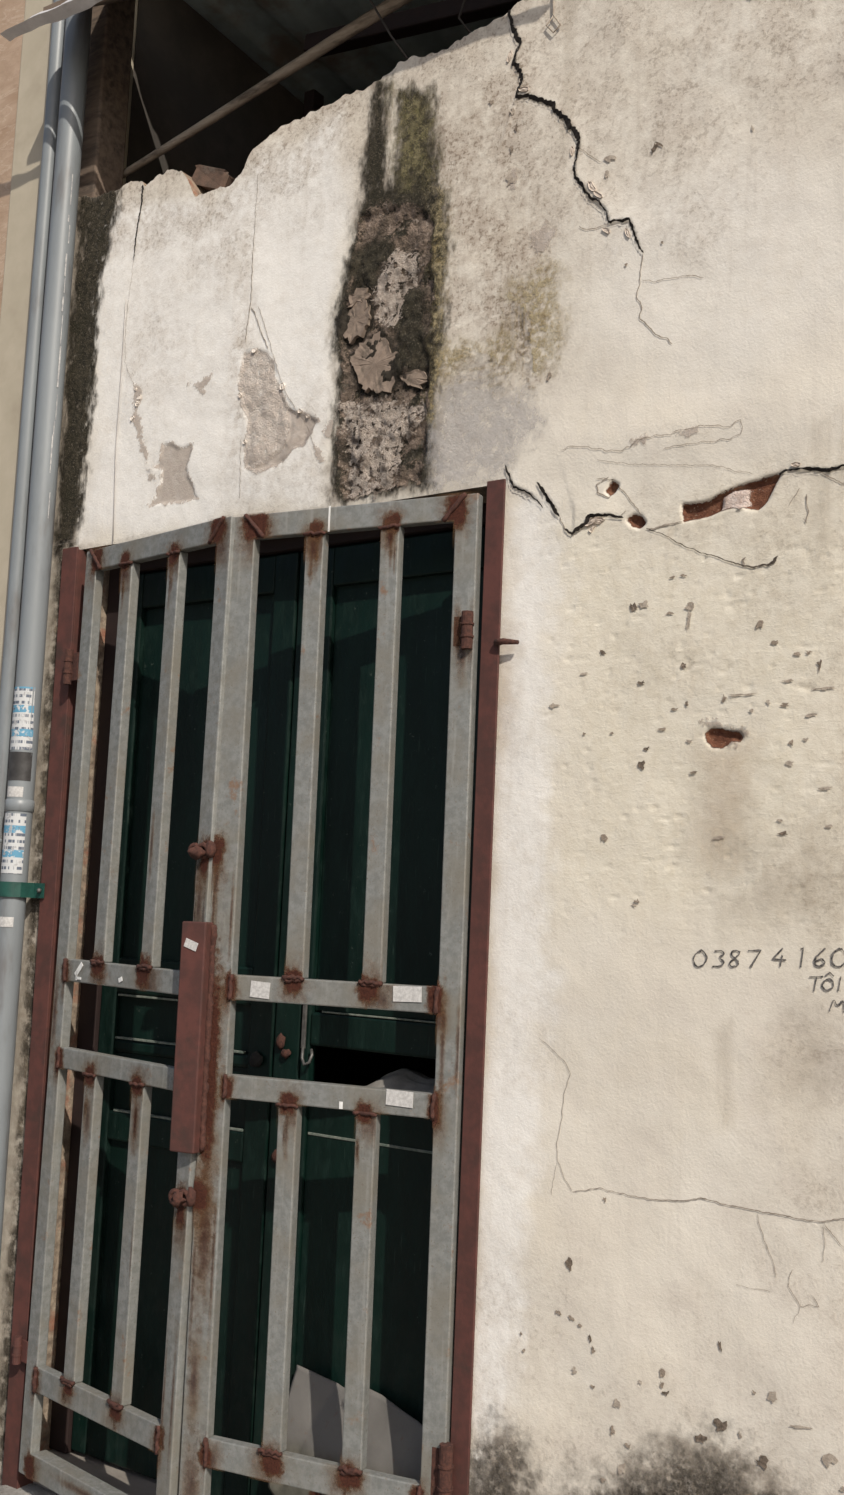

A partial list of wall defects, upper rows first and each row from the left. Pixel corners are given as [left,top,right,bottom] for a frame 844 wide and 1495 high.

peeling [130,384,199,508]
spalling [238,198,436,501]
leakage [331,80,451,505]
crack [507,10,704,344]
crack [505,419,844,568]
flaking render [683,474,781,522]
leakage [0,188,122,1461]
rust [194,835,233,928]
spalling [698,694,749,749]
rust [176,949,237,1321]
crack [540,1039,844,1323]
leakage [596,1453,776,1495]